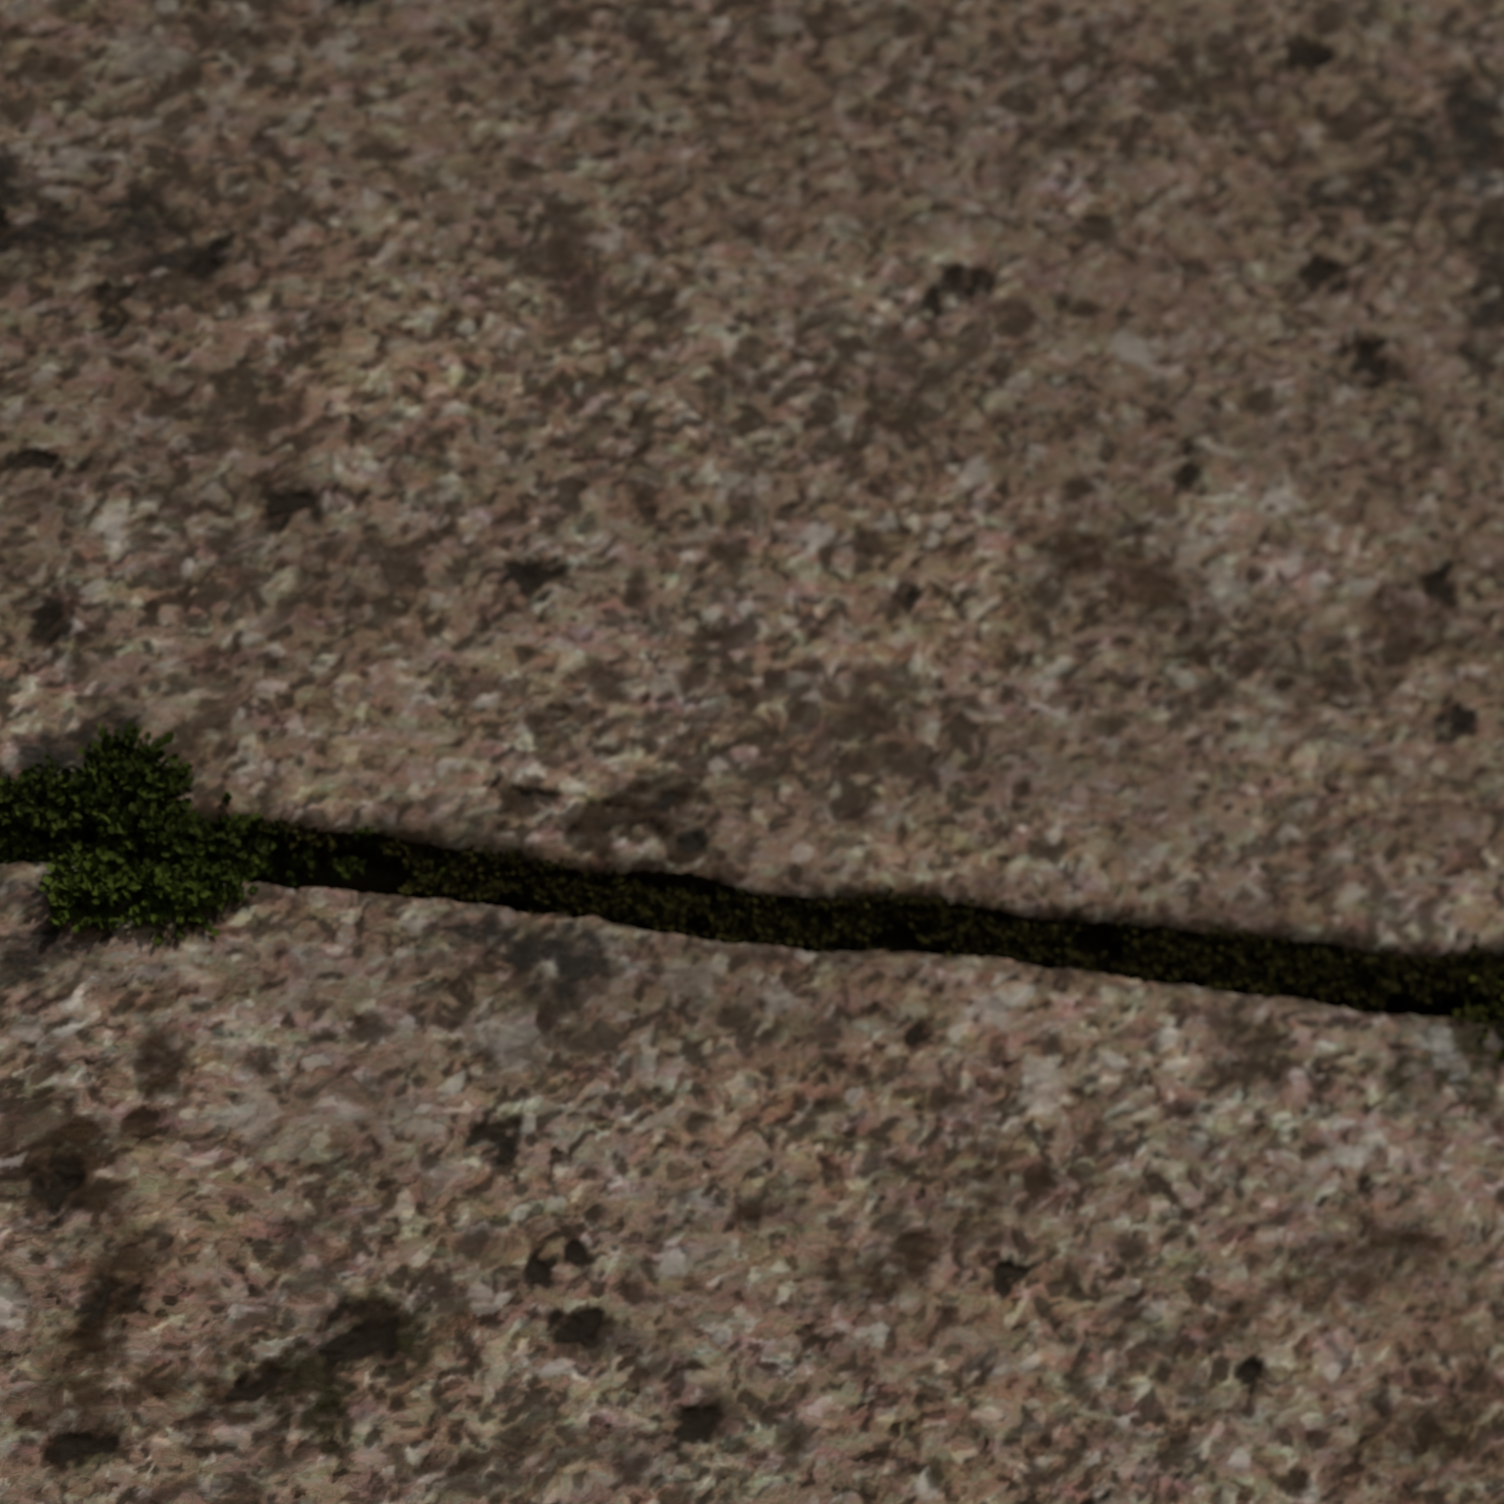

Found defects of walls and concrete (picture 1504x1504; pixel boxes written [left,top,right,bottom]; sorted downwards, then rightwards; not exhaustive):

crack [0,799,1504,1023]